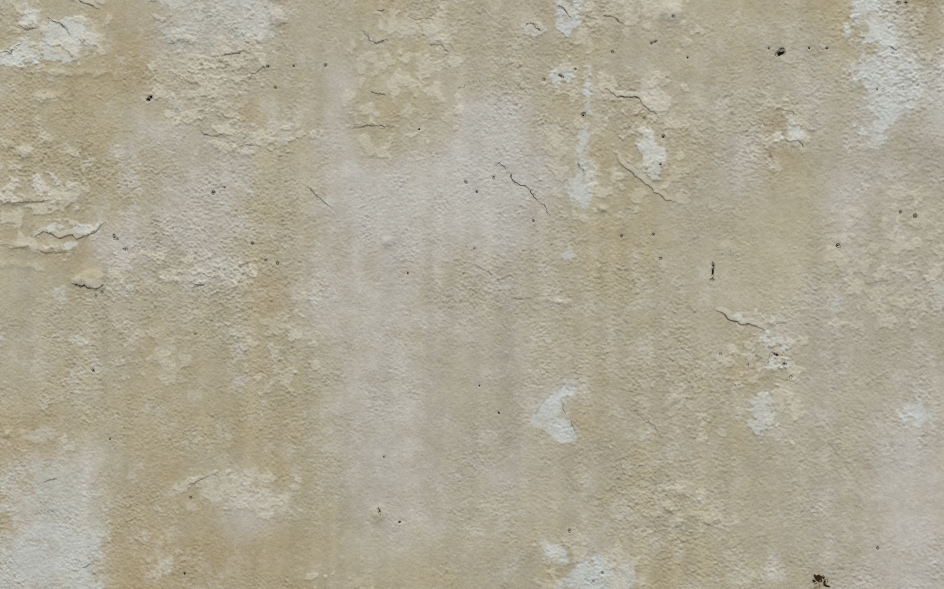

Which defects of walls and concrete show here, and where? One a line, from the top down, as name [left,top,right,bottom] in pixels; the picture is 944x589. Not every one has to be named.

peeling [515,0,696,225]
peeling [0,0,328,303]
crack [612,149,676,202]
crack [32,221,104,239]
peeling [0,279,321,589]
peeling [521,376,584,451]
peeling [531,522,648,589]